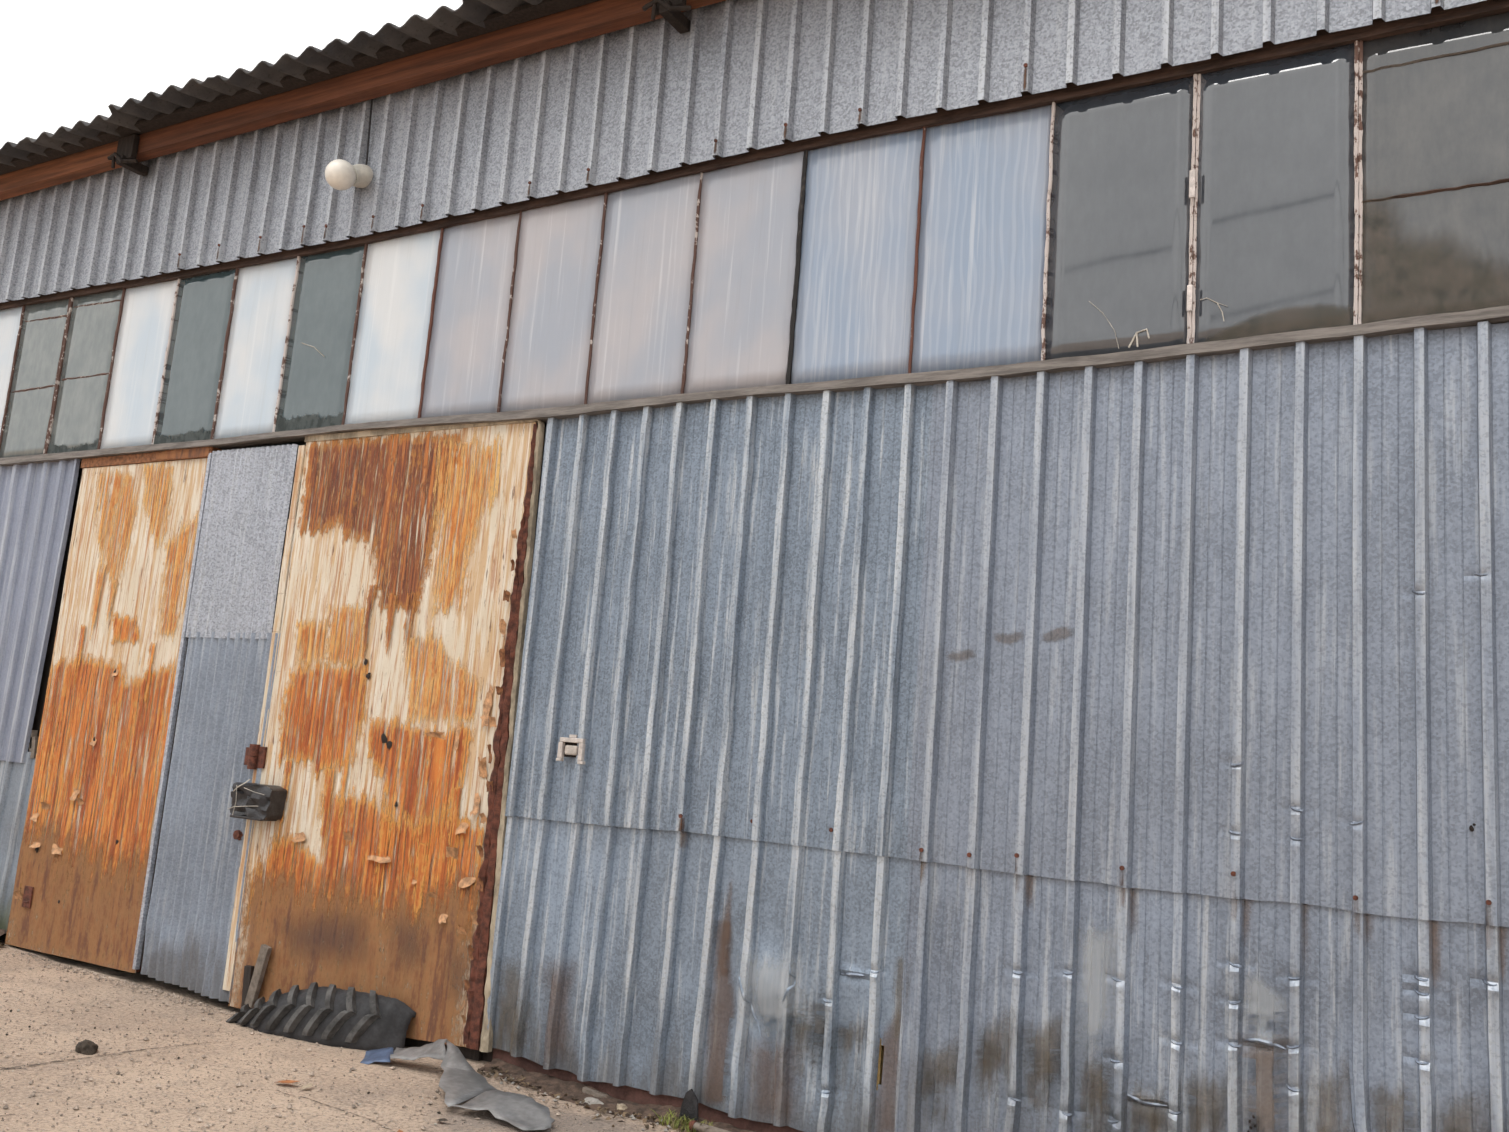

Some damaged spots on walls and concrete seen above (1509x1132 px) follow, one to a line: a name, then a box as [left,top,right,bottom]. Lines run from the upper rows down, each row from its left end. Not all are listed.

rust [5,447,210,973]
rust [228,430,503,1047]
water stain [1252,1046,1278,1132]